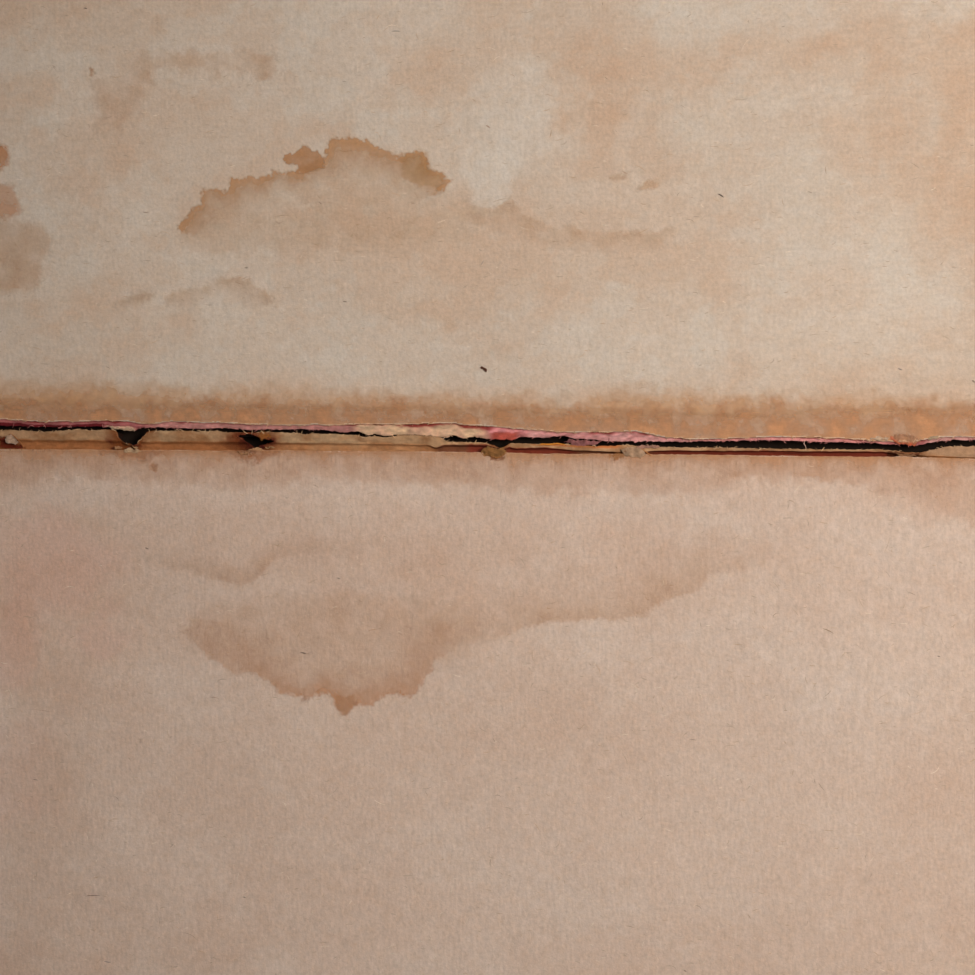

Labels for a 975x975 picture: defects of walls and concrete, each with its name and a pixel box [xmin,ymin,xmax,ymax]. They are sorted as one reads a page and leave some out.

water stain [283,138,450,190]
crack [0,419,975,456]